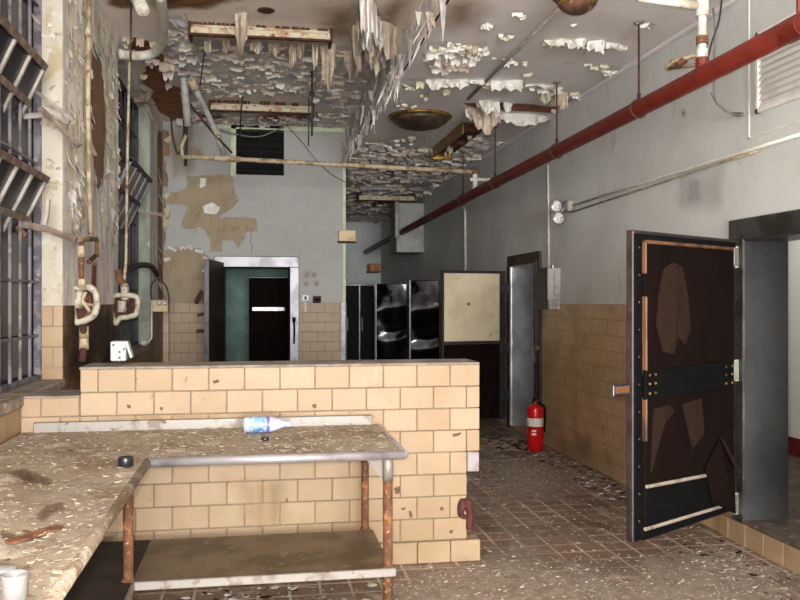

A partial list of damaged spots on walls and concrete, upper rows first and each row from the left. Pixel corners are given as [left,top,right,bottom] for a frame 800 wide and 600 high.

peeling [40,0,121,250]
peeling [157,130,258,303]
peeling [140,0,582,224]
peeling [542,23,629,78]